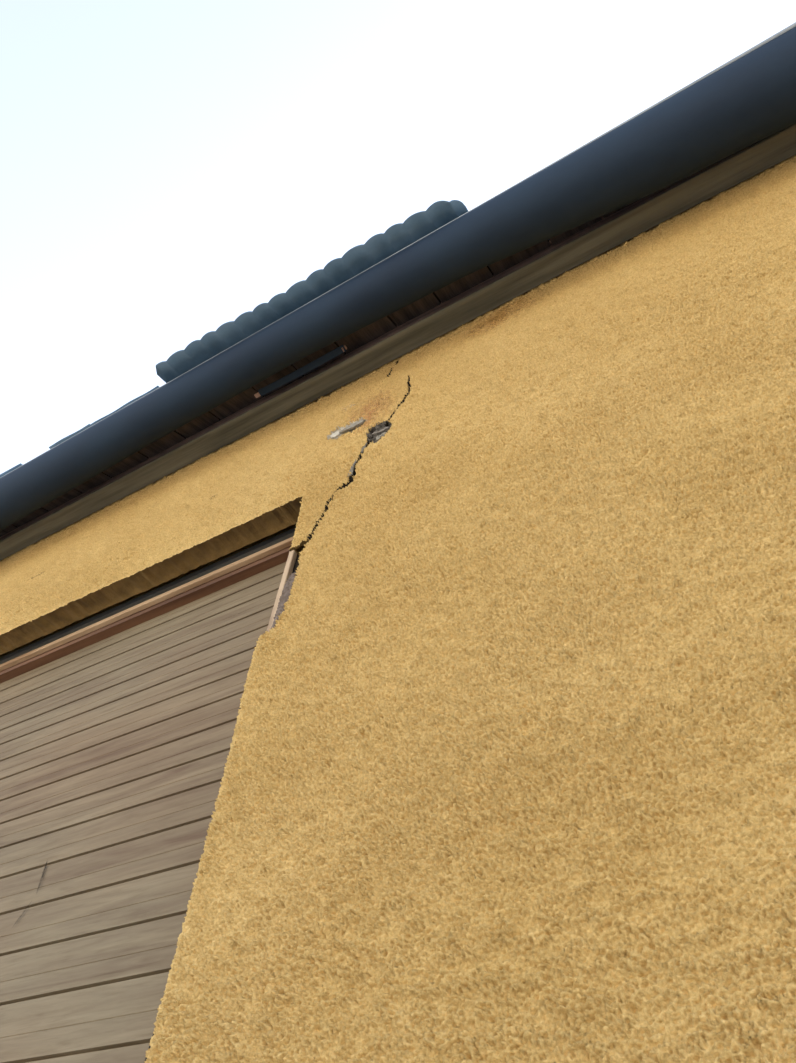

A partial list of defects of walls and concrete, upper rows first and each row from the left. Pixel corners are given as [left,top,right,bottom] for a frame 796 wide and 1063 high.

crack [308,361,411,540]